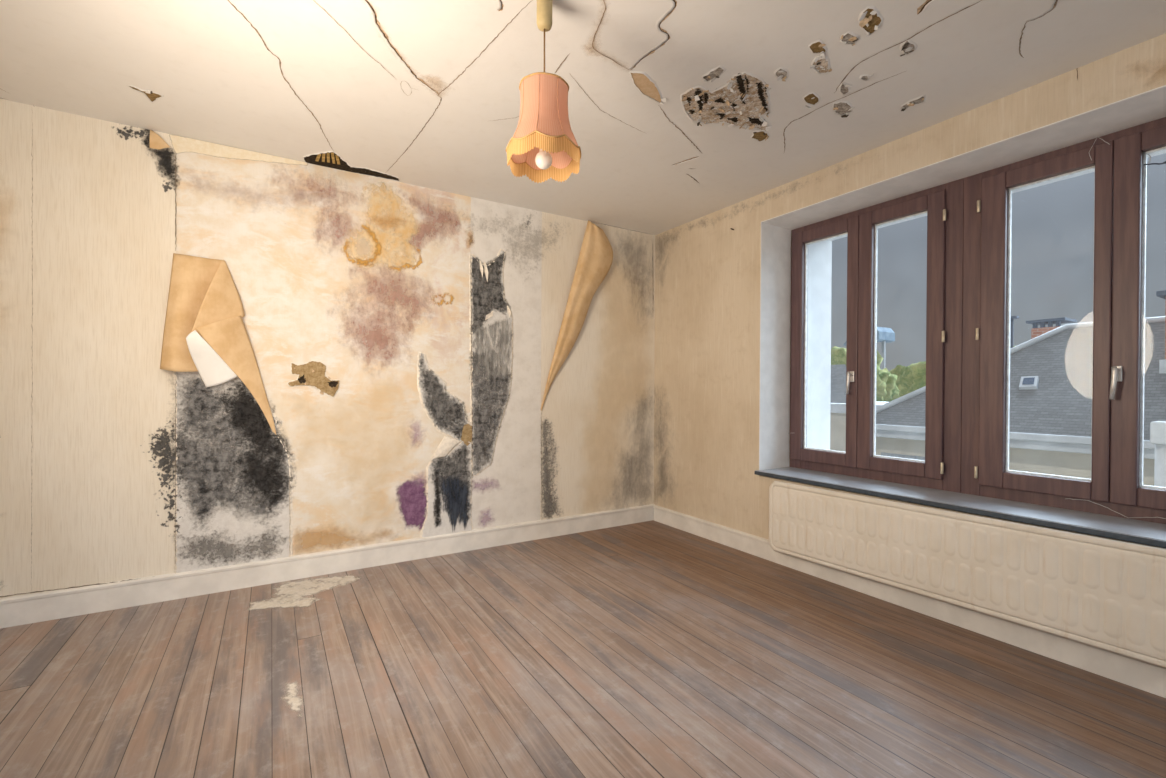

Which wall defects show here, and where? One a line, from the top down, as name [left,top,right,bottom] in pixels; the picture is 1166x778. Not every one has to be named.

flaking render [840,6,884,46]
crack [228,0,333,150]
crack [321,0,530,170]
crack [555,0,702,184]
flaking render [629,65,789,142]
crack [783,0,982,152]
damp [113,126,178,192]
flaking render [302,151,400,181]
damp [330,184,458,317]
damp [351,315,395,360]
flaking render [287,361,340,397]
damp [397,480,428,529]